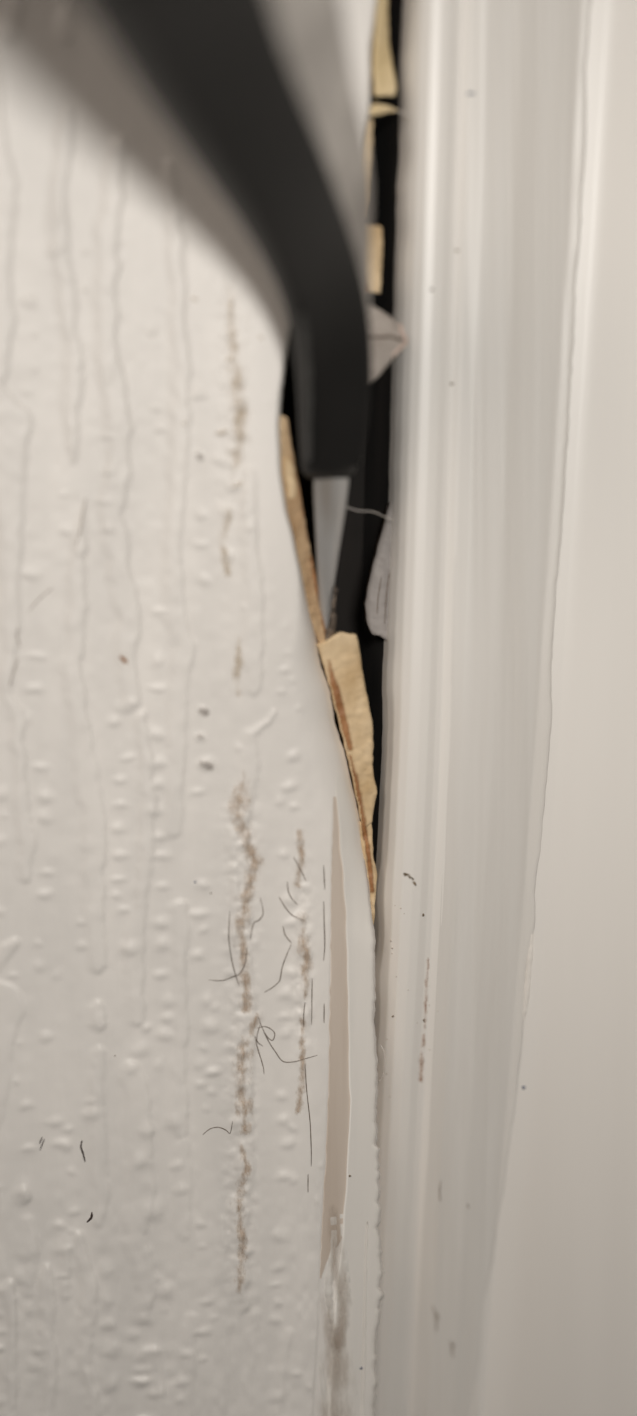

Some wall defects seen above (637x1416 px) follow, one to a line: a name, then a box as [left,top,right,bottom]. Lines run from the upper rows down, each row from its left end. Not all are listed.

crack [368,84,376,186]
spalling [366,0,399,193]
spalling [370,225,383,293]
crack [281,333,365,787]